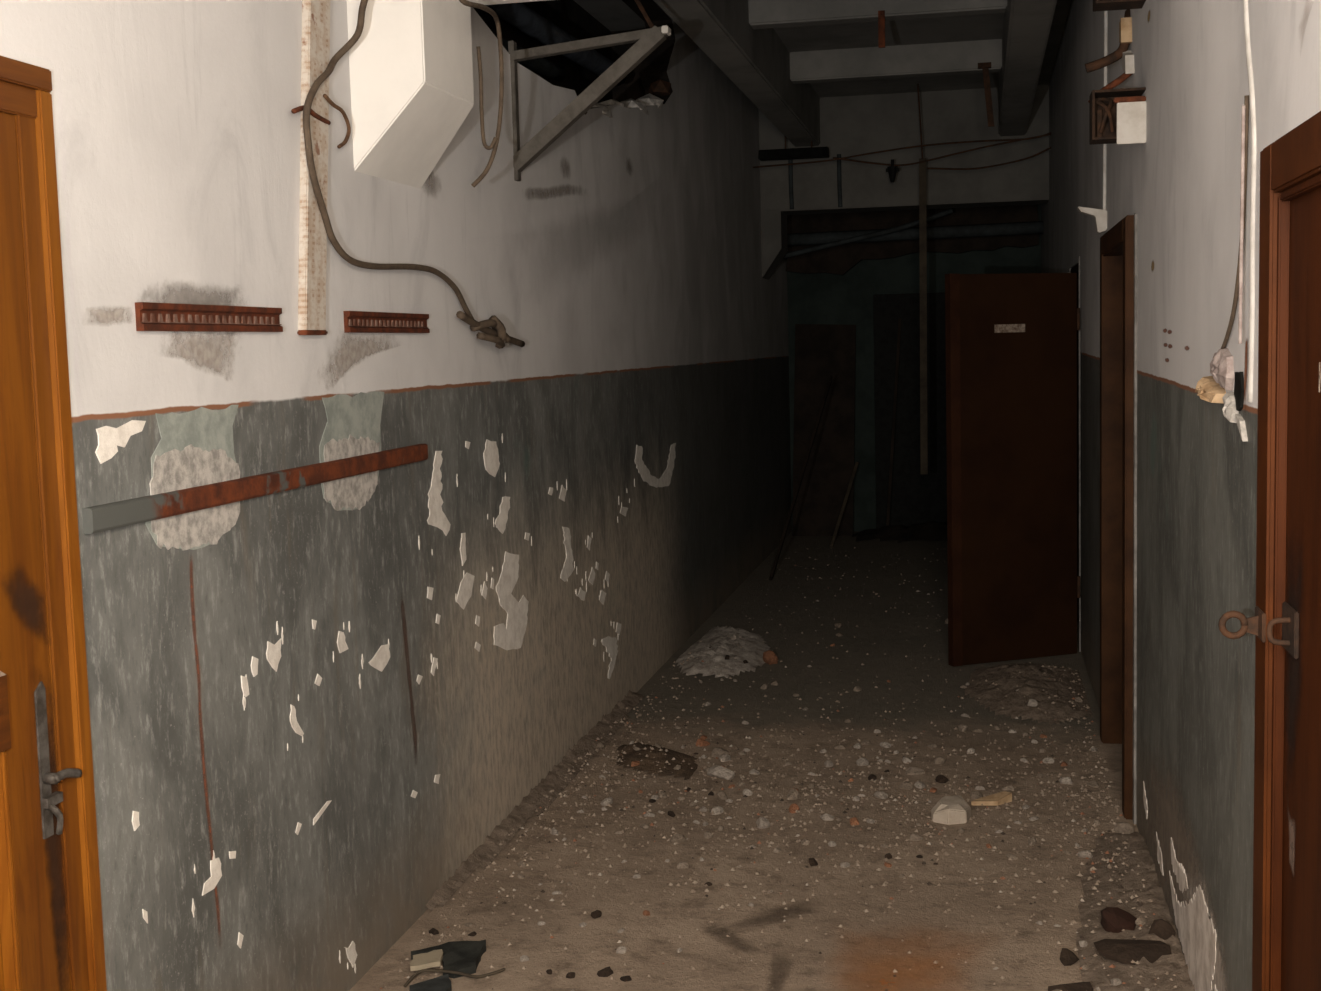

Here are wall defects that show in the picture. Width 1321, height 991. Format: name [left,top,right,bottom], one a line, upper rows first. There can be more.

damp [157,287,231,306]
peeling [319,338,388,463]
peeling [95,405,240,495]
peeling [145,501,240,551]
peeling [321,470,379,511]
peeling [427,451,532,652]
peeling [465,434,510,534]
peeling [241,621,284,710]
peeling [333,621,390,689]
peeling [287,694,304,751]
peeling [192,850,236,917]
peeling [1156,832,1225,991]